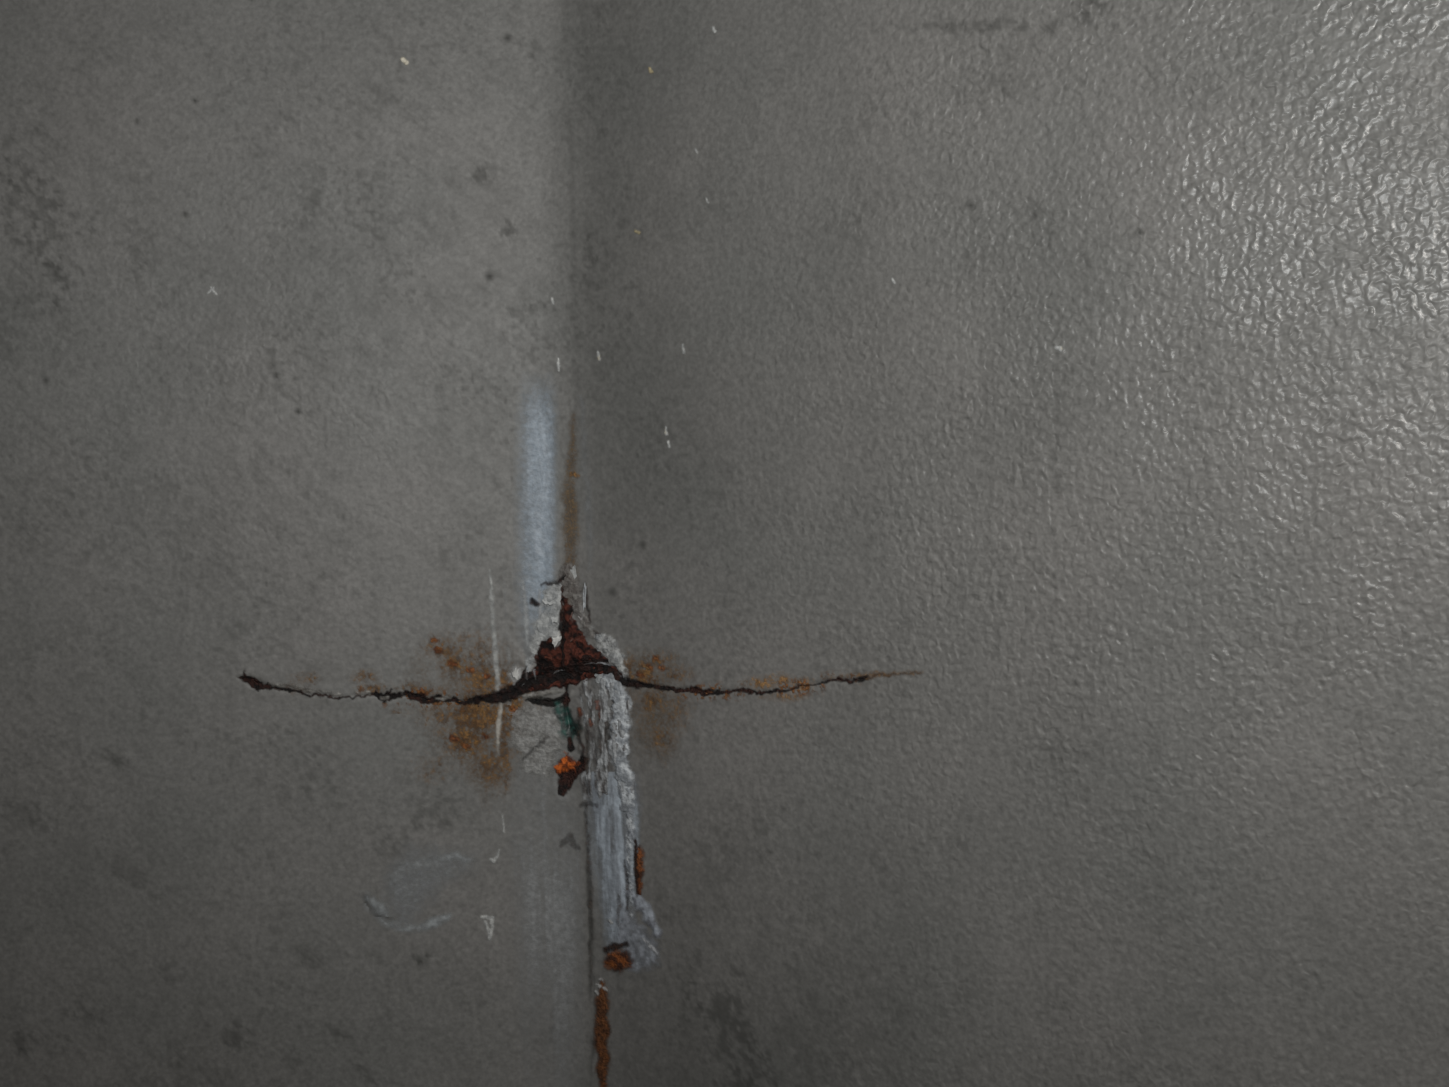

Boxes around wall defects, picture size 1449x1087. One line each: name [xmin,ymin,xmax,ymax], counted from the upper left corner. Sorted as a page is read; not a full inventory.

crack [239,667,570,708]
rust [403,638,531,779]
peeling [477,563,641,777]
crack [558,586,566,642]
crack [606,662,890,696]
rust [554,656,677,1087]